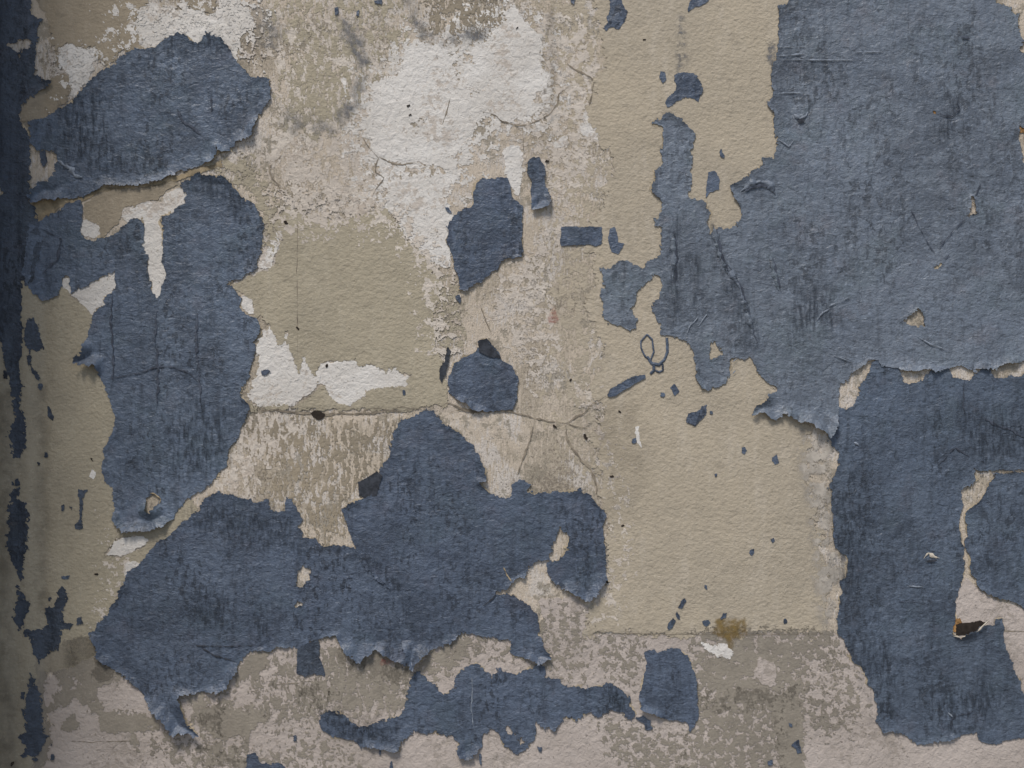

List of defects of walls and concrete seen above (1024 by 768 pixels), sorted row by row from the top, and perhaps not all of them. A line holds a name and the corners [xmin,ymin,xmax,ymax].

crack [488,63,594,150]
crack [362,137,415,194]
peeling [340,414,382,492]
crack [250,397,604,500]